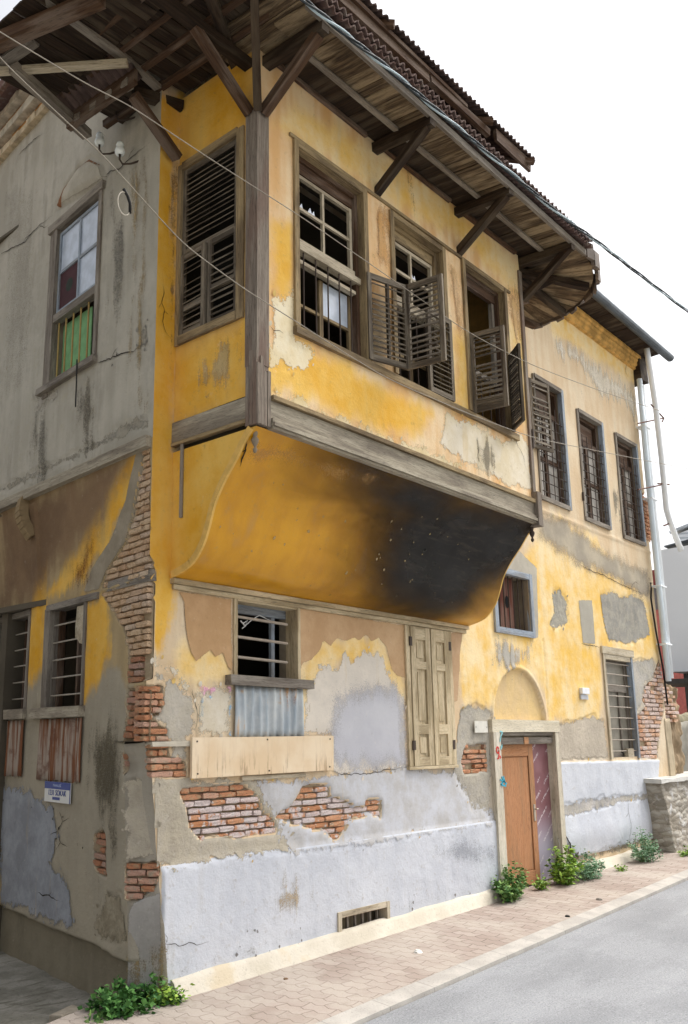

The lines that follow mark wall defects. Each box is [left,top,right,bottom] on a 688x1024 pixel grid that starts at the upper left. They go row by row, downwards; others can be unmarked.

crack [101,287,169,362]
peeling [269,288,315,376]
peeling [274,387,531,491]
damp [477,437,495,471]
peeling [84,448,494,943]
flaking render [637,660,664,759]
peeling [0,785,75,929]